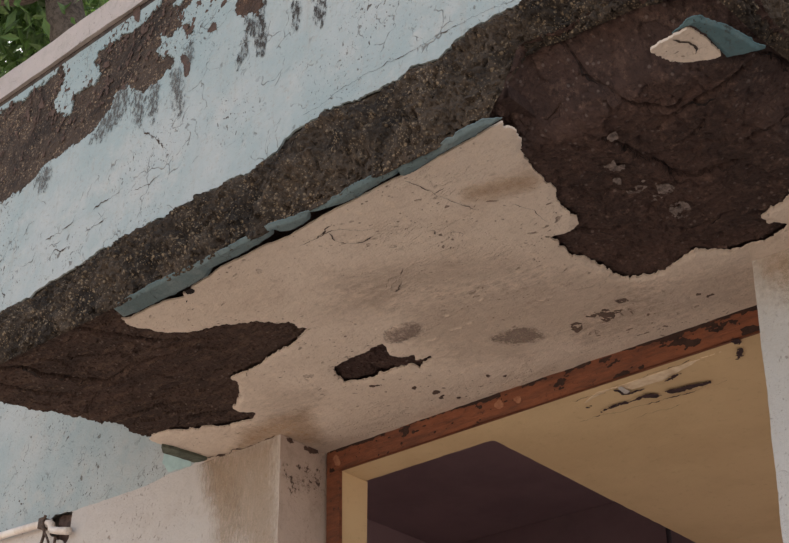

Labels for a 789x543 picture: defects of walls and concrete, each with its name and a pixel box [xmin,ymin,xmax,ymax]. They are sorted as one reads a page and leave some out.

spalling [0,0,789,364]
spalling [334,344,431,379]
damp [492,328,541,344]
peeling [522,305,760,417]
peeling [330,432,390,457]
peeling [399,393,508,446]